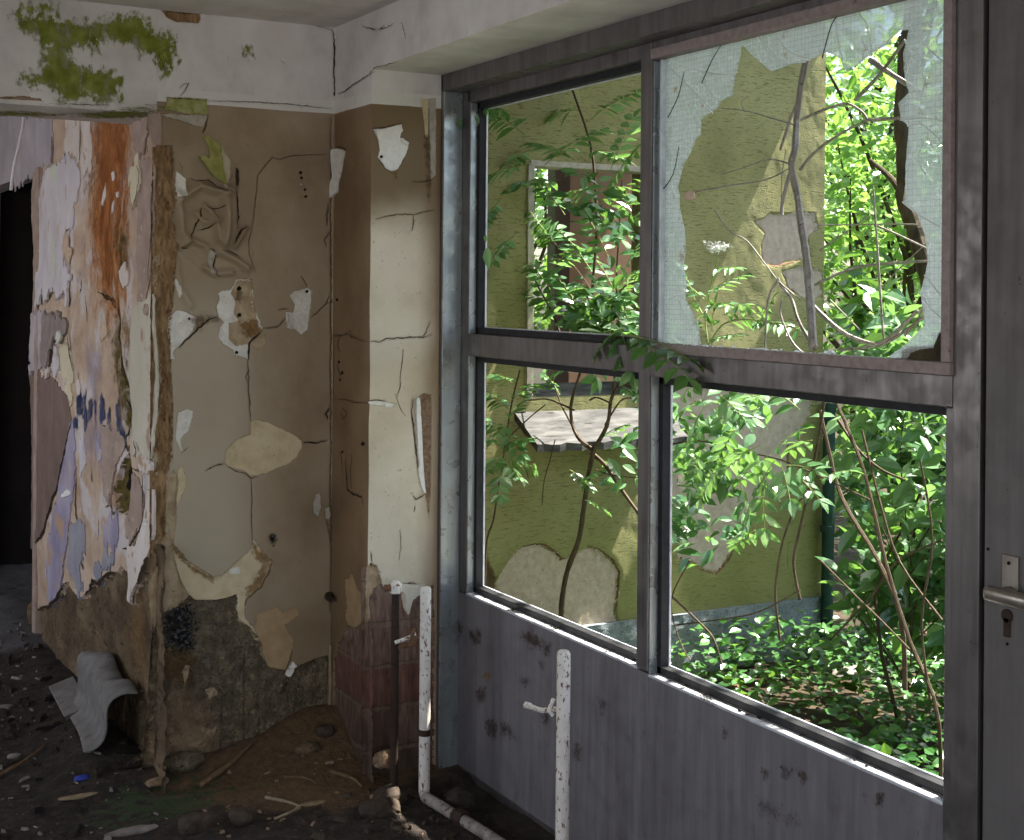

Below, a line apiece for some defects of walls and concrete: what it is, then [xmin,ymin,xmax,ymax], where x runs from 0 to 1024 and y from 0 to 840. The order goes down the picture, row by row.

water stain [18,1,59,17]
peeling [0,96,55,104]
water stain [158,49,172,79]
corrosion [84,122,133,330]
spalling [754,212,824,299]
crack [220,26,432,611]
spalling [13,97,436,794]
spalling [486,543,620,625]